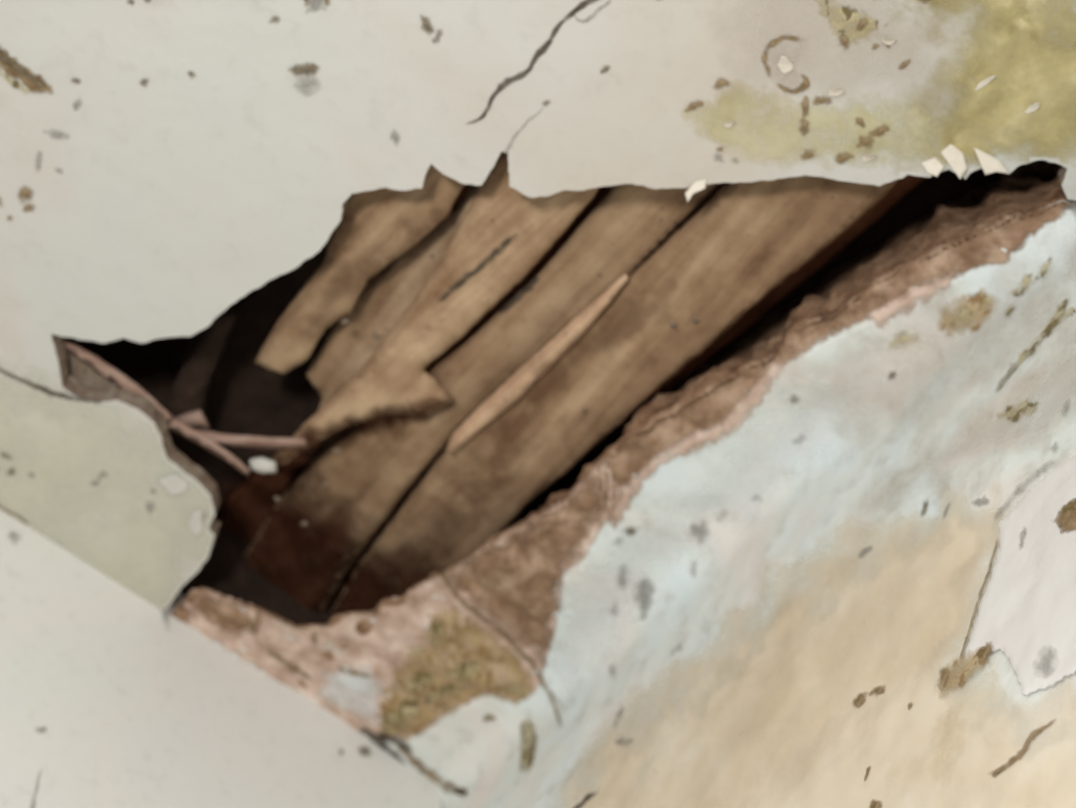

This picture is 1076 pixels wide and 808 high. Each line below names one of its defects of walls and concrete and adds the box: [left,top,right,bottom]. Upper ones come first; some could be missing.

spalling [0,50,52,93]
crack [470,0,609,123]
damp [686,0,1076,163]
peeling [18,187,33,212]
peeling [685,179,707,202]
peeling [922,144,1011,179]
spalling [183,196,1076,755]
damp [564,496,1076,808]
crack [362,728,466,803]